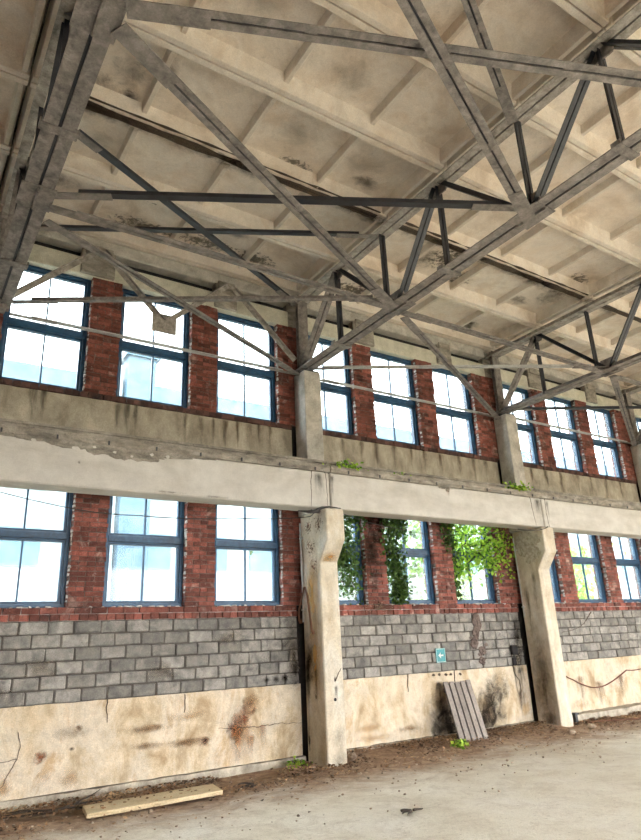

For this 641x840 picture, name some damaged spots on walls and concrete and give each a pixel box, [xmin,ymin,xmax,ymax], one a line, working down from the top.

peeling [0,433,215,462]
rust [227,703,255,739]
crack [0,732,21,789]